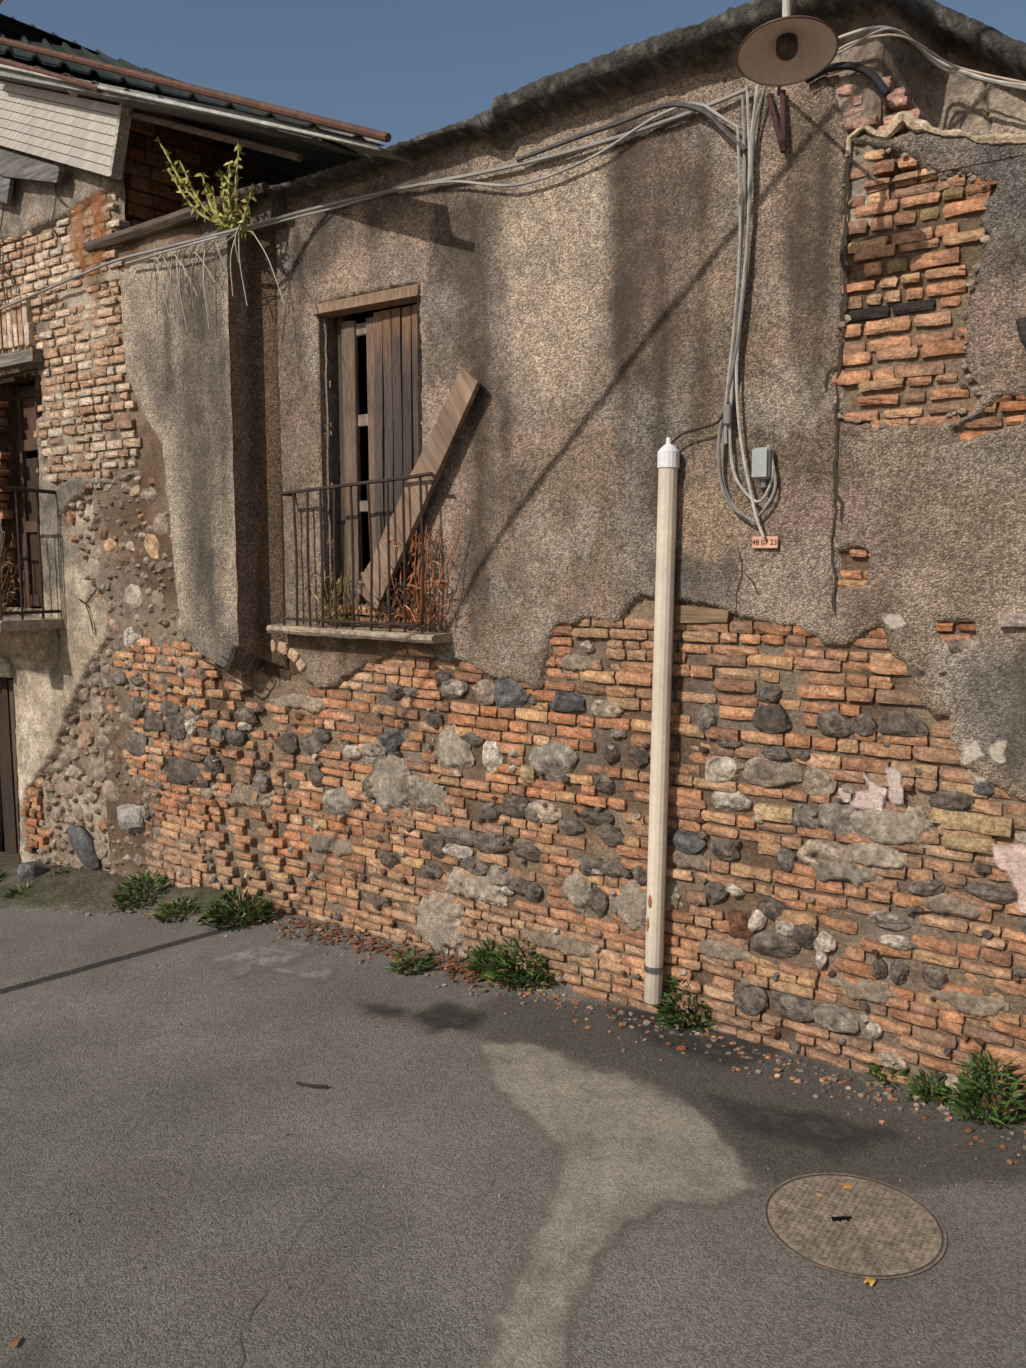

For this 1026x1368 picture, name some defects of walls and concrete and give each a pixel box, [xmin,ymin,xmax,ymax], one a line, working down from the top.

damp [614,124,662,344]
crack [824,149,849,618]
spalling [827,73,1026,442]
spalling [0,192,1026,1116]